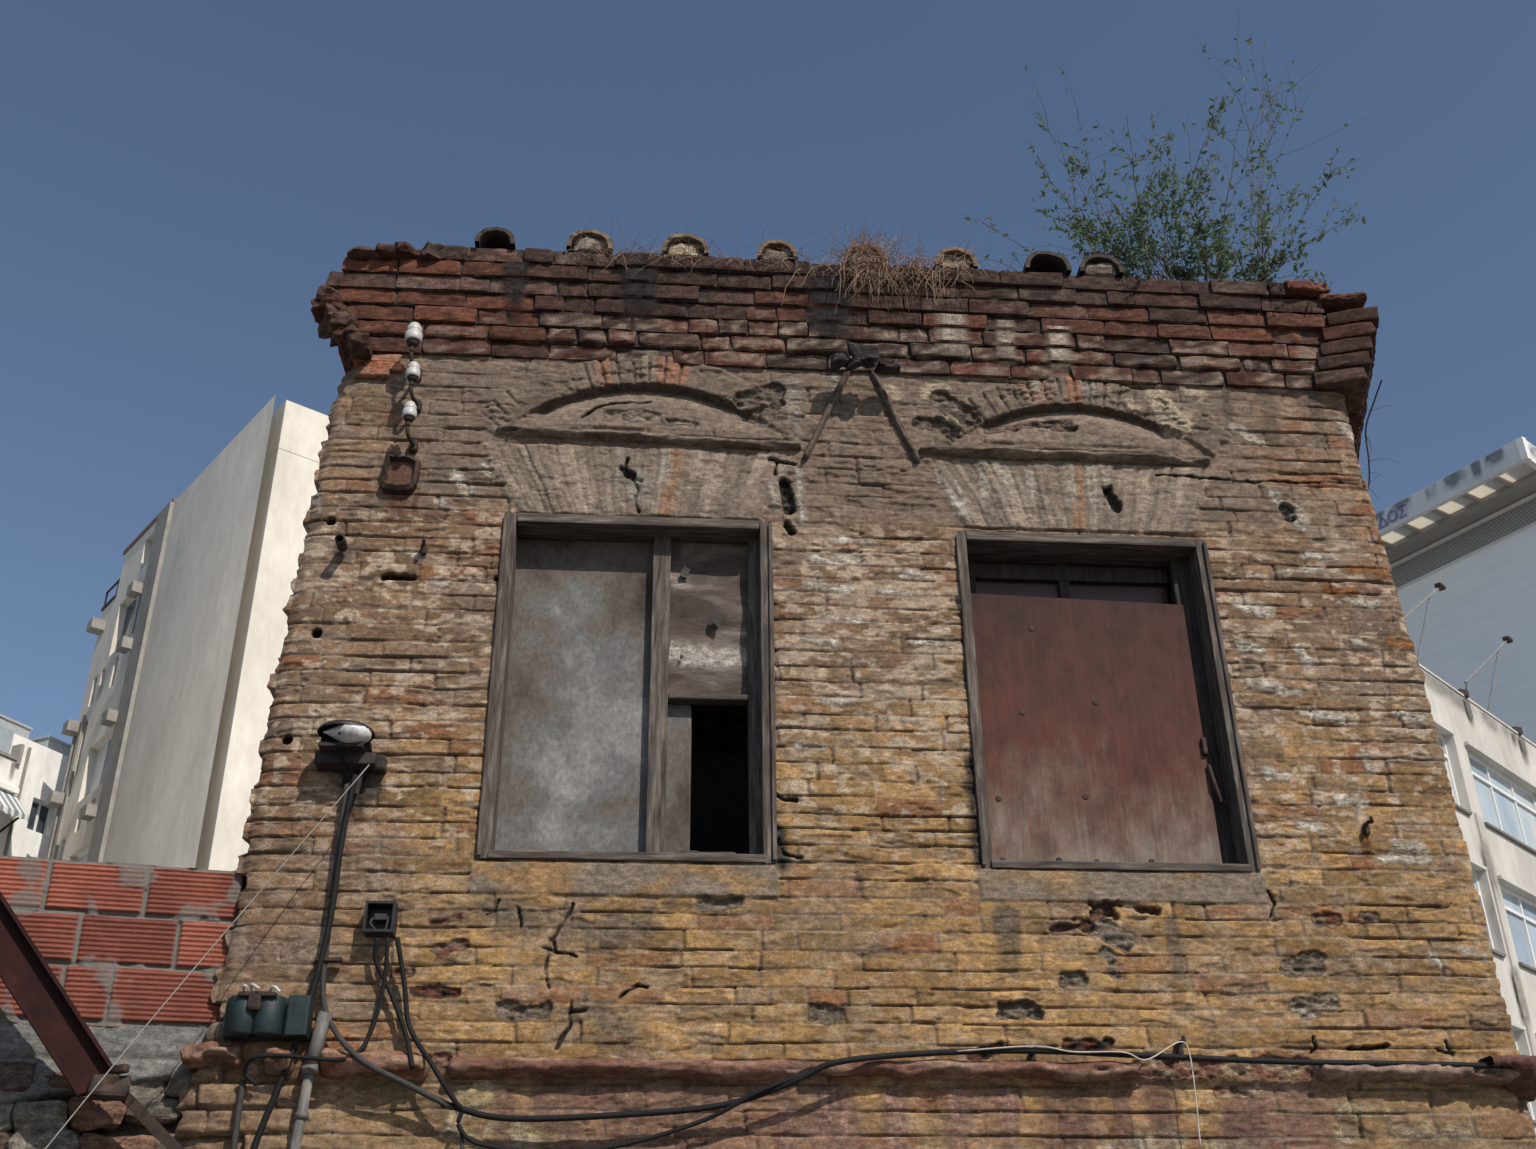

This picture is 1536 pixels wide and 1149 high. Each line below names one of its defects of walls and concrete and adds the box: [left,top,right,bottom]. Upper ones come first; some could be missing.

crack [624,460,642,514]
spalling [1050,902,1160,981]
crack [492,900,648,1050]
spalling [1059,971,1088,987]
spalling [808,1004,847,1026]
spalling [996,1000,1043,1020]